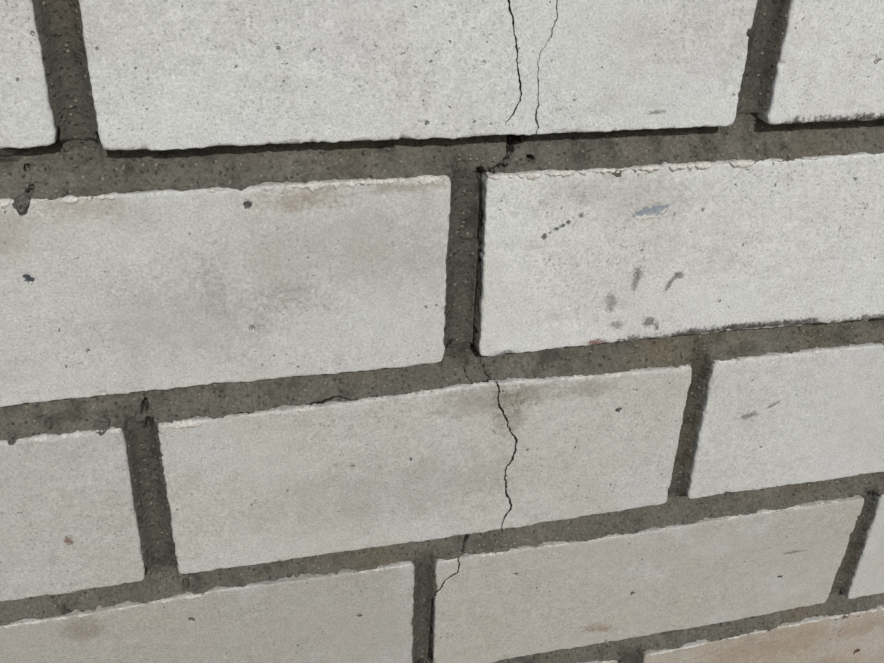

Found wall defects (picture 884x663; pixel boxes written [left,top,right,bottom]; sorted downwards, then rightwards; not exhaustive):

crack [464,0,558,533]
crack [421,534,470,663]